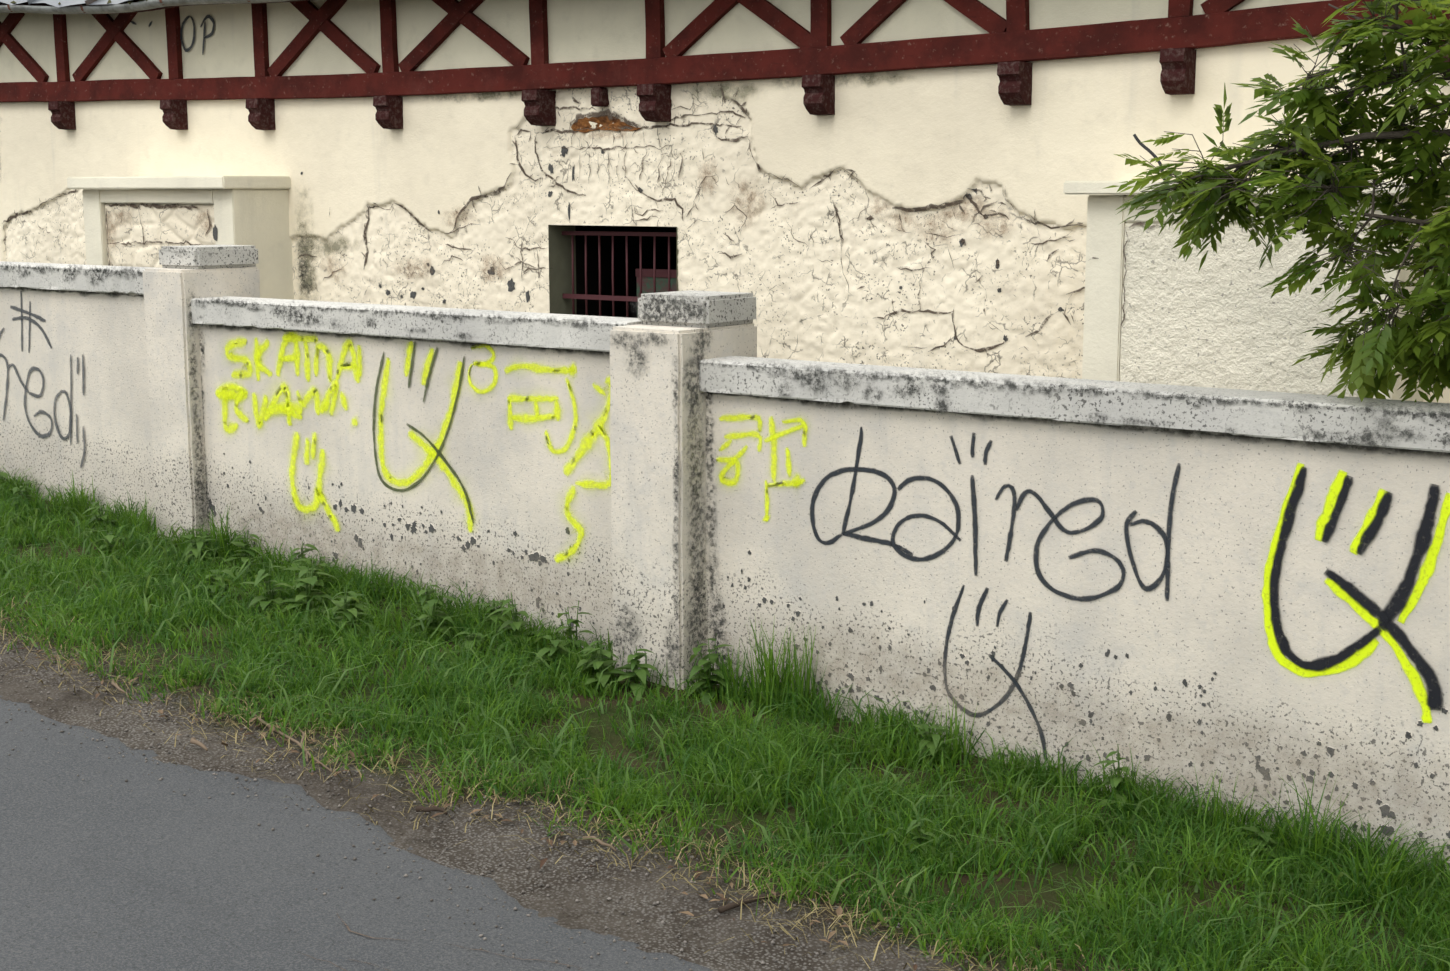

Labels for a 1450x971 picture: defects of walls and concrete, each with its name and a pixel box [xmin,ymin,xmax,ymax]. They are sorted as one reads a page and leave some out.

flaking render [4,189,87,265]
damp [299,224,346,289]
flaking render [292,82,1087,379]
crack [298,86,1159,355]
damp [189,295,1450,672]